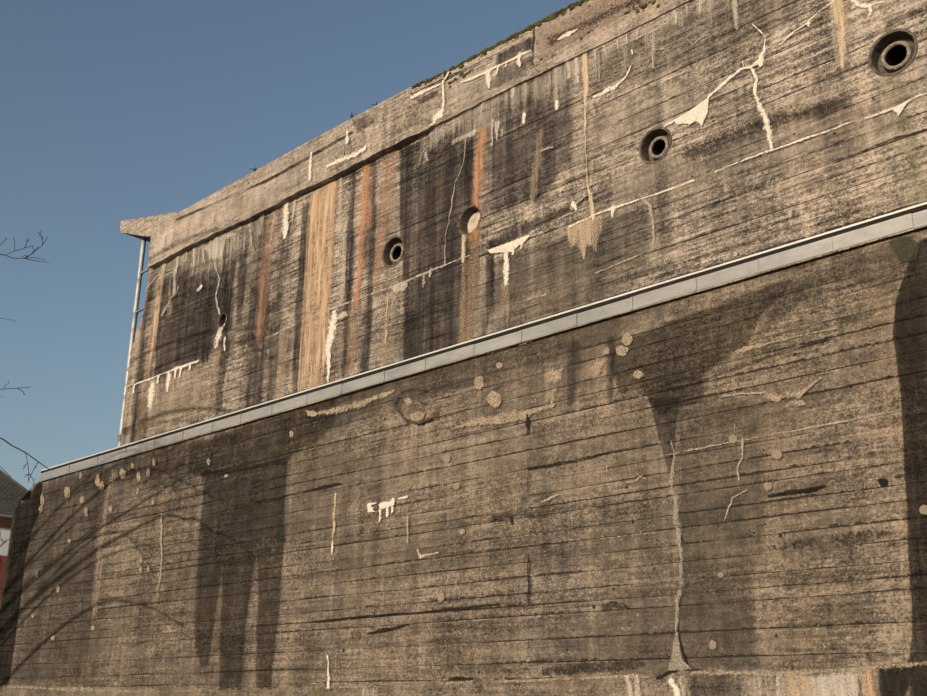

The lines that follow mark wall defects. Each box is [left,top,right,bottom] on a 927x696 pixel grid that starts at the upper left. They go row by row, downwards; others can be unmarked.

water stain [127,200,296,442]
corrosion [257,212,275,342]
corrosion [298,179,337,392]
corrosion [348,163,384,369]
water stain [322,122,476,382]
corrosion [461,229,480,325]
corrosion [473,131,486,207]
water stain [487,232,529,288]
water stain [567,180,694,256]
crack [708,0,834,149]
crack [524,413,886,680]
water stain [692,238,927,696]